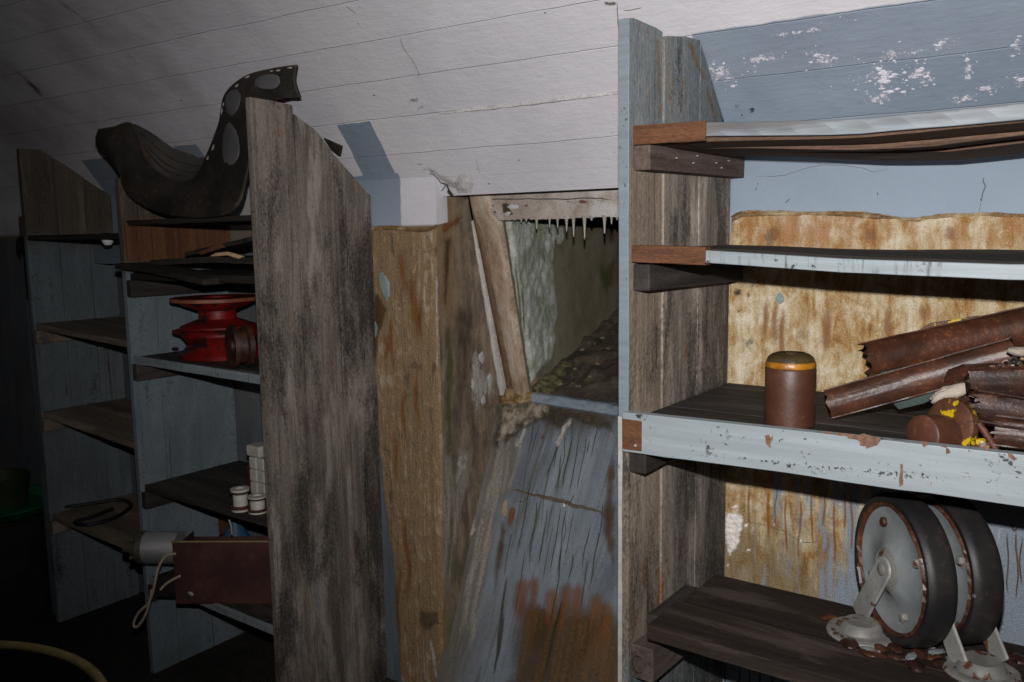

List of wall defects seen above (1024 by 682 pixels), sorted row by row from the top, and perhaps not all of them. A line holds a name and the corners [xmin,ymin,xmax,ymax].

peeling [689,43,787,118]
peeling [805,45,838,71]
peeling [848,38,959,108]
peeling [947,52,1024,106]
damp [730,210,1024,250]
damp [727,265,1024,392]
damp [459,219,603,667]
crack [513,489,602,513]
damp [724,457,929,606]
damp [967,499,1024,646]
rust [516,582,618,682]